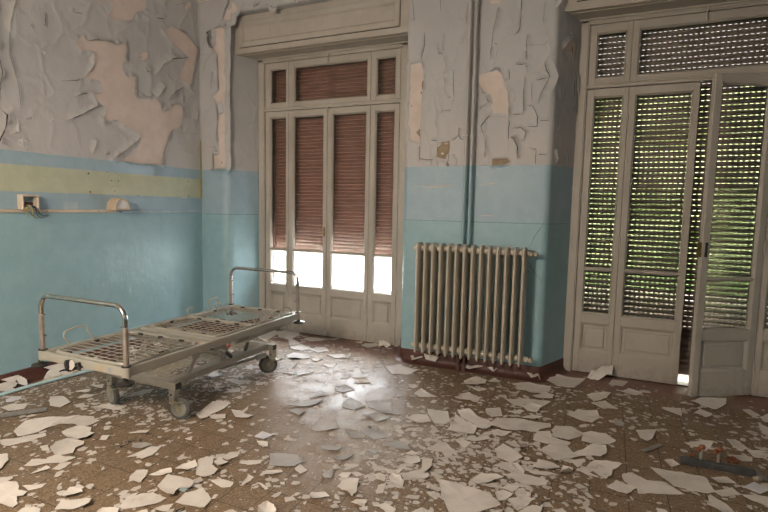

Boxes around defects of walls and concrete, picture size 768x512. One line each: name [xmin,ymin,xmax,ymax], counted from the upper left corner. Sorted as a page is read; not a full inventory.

peeling [67,27,187,171]
peeling [158,0,241,174]
peeling [405,58,455,164]
peeling [476,64,515,121]
peeling [556,30,579,130]